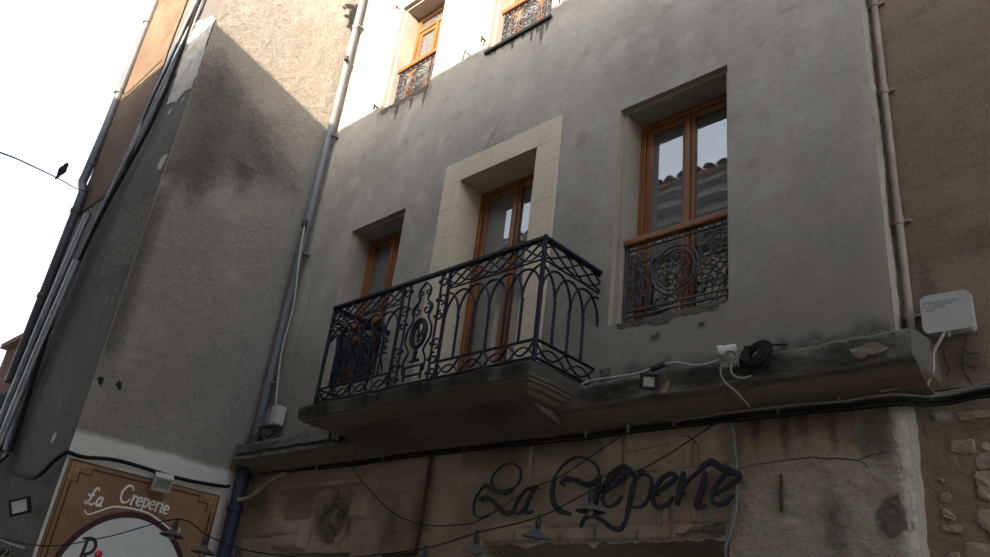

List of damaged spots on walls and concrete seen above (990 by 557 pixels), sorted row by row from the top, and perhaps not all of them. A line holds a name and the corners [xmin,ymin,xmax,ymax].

flaking render [167,16,215,114]
crack [740,451,891,469]